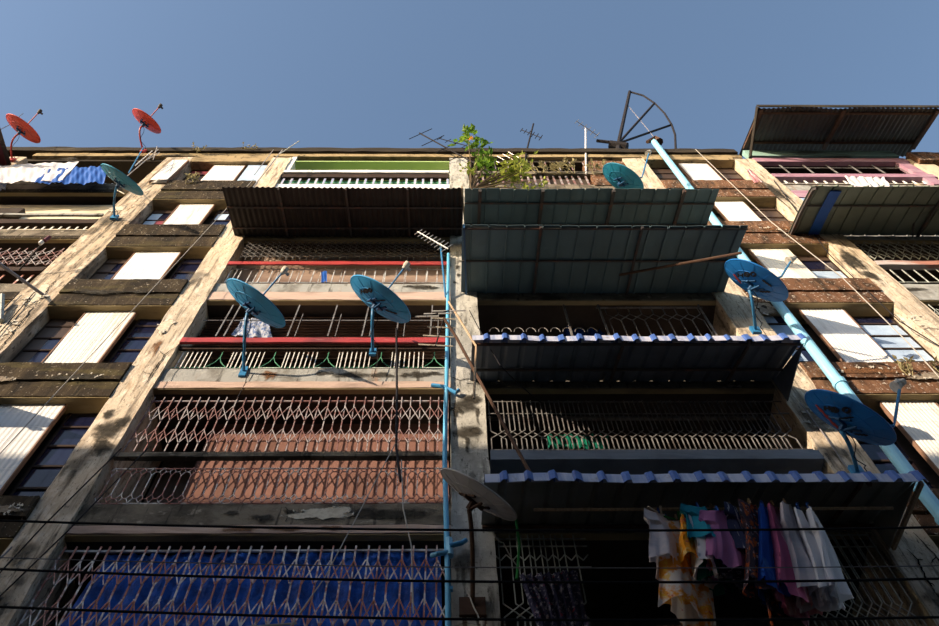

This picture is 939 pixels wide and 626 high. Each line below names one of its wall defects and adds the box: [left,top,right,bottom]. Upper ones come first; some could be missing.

leakage [89,409,130,456]
leakage [450,394,481,452]